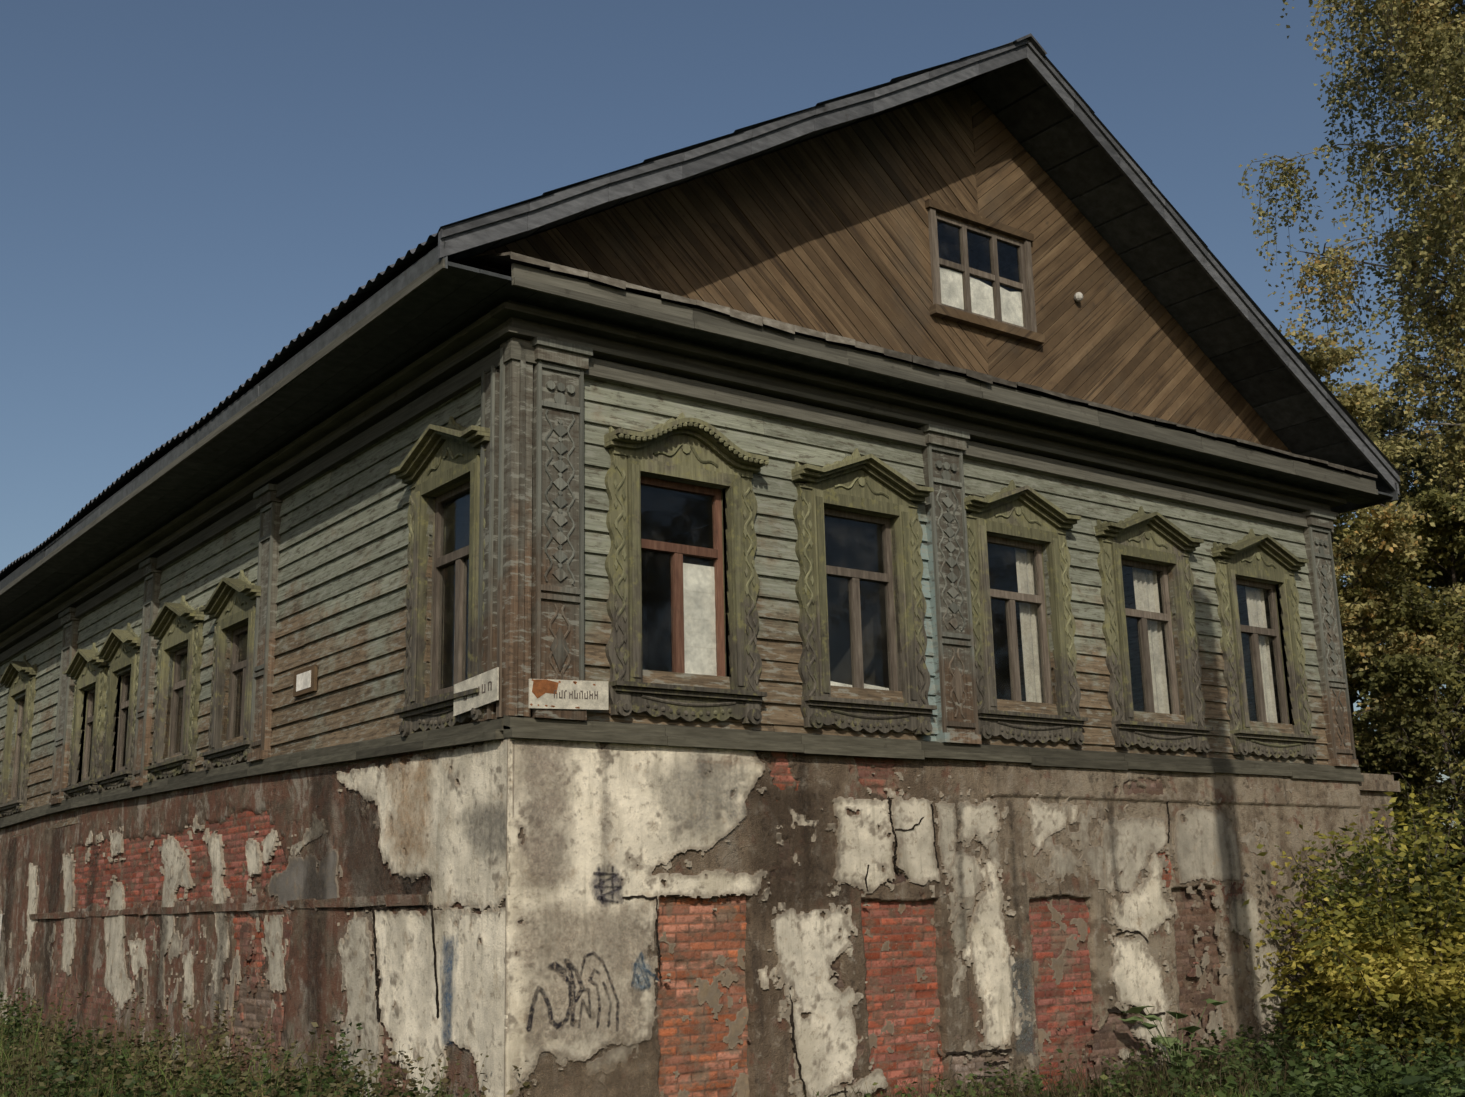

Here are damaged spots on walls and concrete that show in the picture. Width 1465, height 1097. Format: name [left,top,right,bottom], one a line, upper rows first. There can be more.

crack [865,796,939,892]
flaking render [1023,792,1078,856]
spalling [43,921,195,1050]
flaking render [74,737,1039,1097]
flaking render [1056,778,1287,1082]